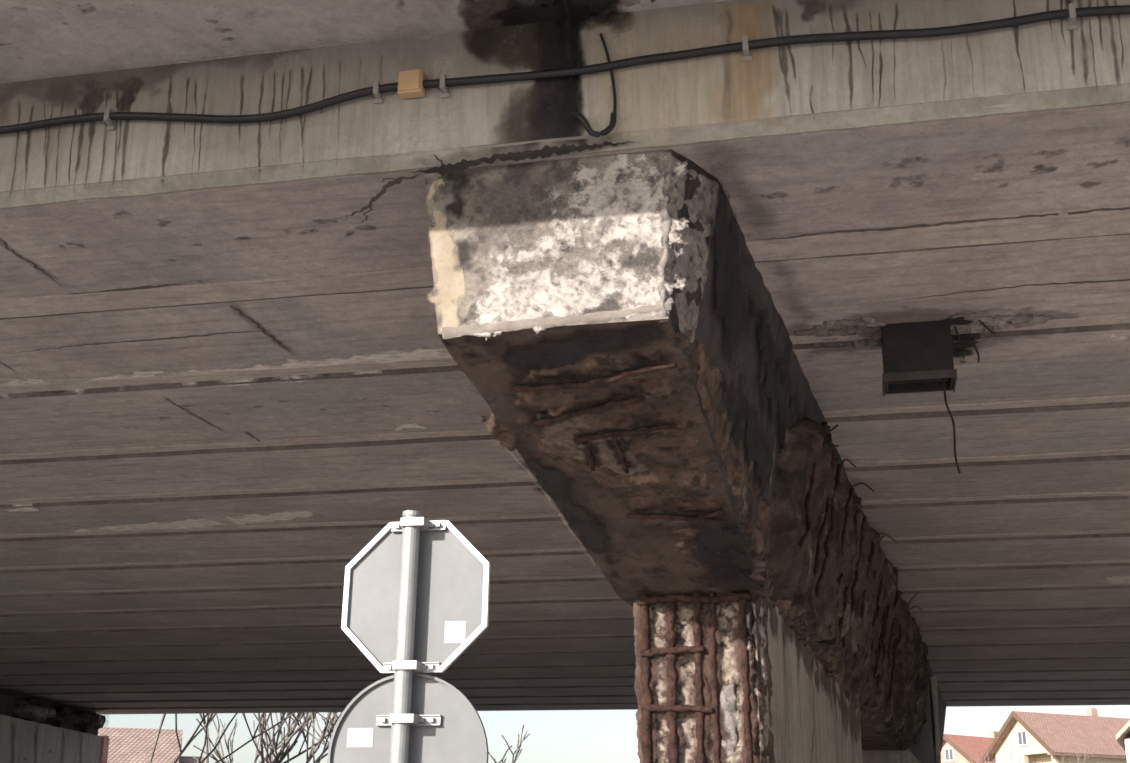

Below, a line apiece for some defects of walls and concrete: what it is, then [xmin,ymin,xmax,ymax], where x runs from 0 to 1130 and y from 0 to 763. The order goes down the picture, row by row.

damp [461,0,634,147]
damp [800,0,898,102]
damp [1046,0,1124,82]
damp [10,78,142,196]
crack [342,141,637,224]
crack [0,239,192,315]
damp [453,241,475,262]
crack [751,207,1130,241]
crack [0,305,303,375]
spalling [942,311,1051,363]
spalling [427,153,941,763]
spalling [12,699,106,730]